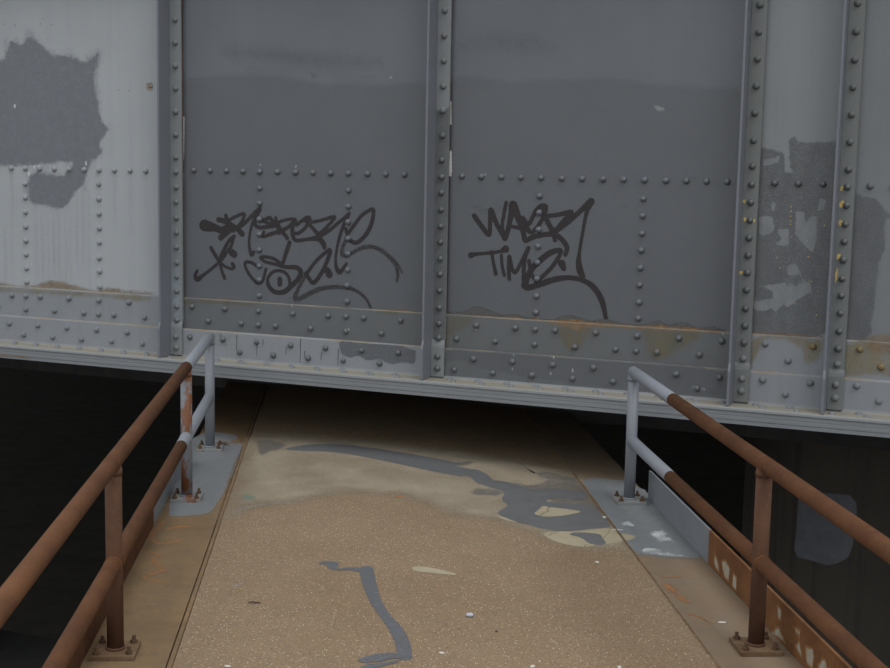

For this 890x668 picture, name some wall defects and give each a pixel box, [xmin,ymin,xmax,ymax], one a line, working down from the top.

peeling [744,199,826,257]
rust [0,280,152,303]
peeling [753,257,812,312]